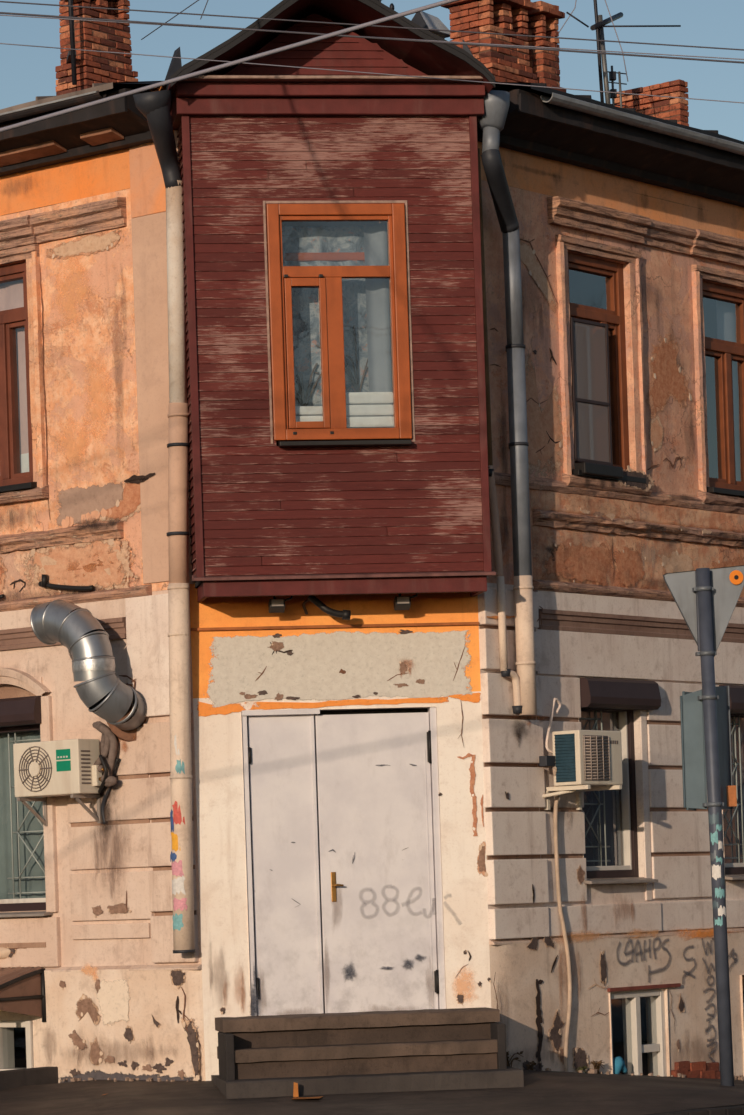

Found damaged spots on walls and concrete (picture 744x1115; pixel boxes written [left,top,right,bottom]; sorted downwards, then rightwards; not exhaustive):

crack [520,239,557,302]
spalling [646,330,694,453]
spalling [61,475,141,528]
spalling [20,536,139,596]
spalling [542,542,612,586]
peeling [458,753,488,877]
spalling [170,969,185,989]
spalling [527,934,555,951]
spalling [599,951,607,986]
spalling [68,979,200,1081]
spalling [547,1009,589,1073]